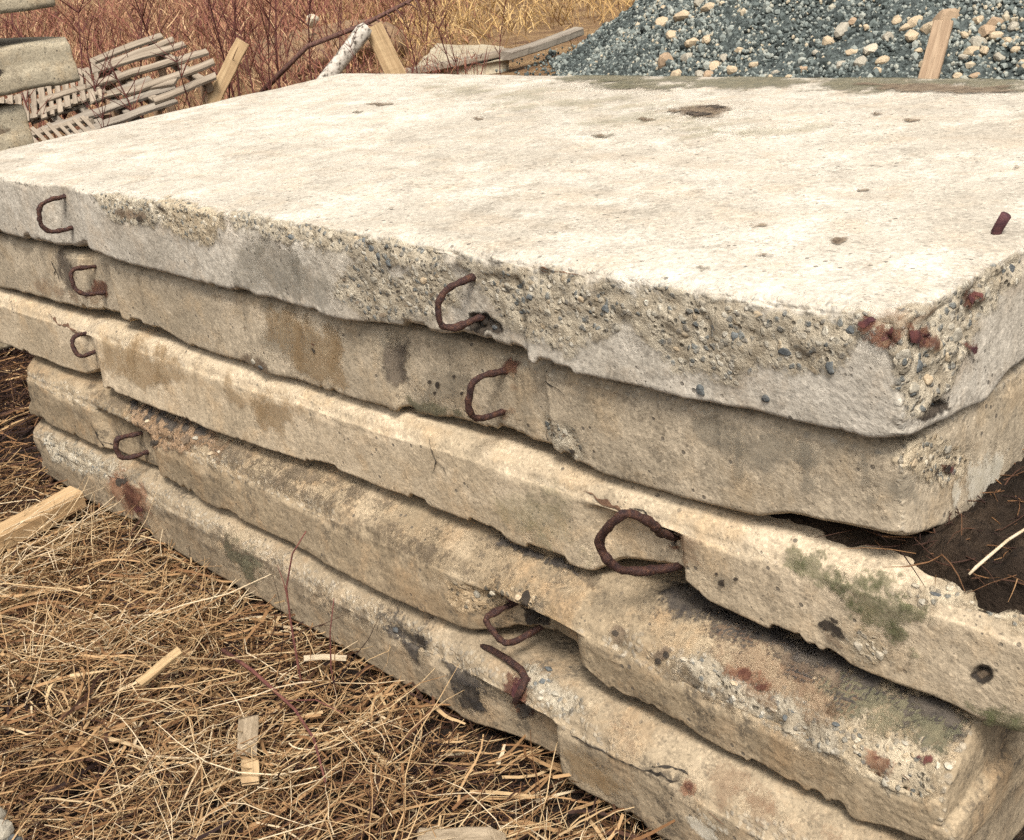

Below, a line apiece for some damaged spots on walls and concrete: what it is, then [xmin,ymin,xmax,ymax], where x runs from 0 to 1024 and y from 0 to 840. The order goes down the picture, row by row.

rust [85,279,108,298]
rust [963,290,985,309]
spalling [456,253,1023,420]
rust [857,316,940,351]
rust [503,357,521,375]
rust [108,463,151,519]
rust [503,672,534,719]
rust [724,665,771,695]